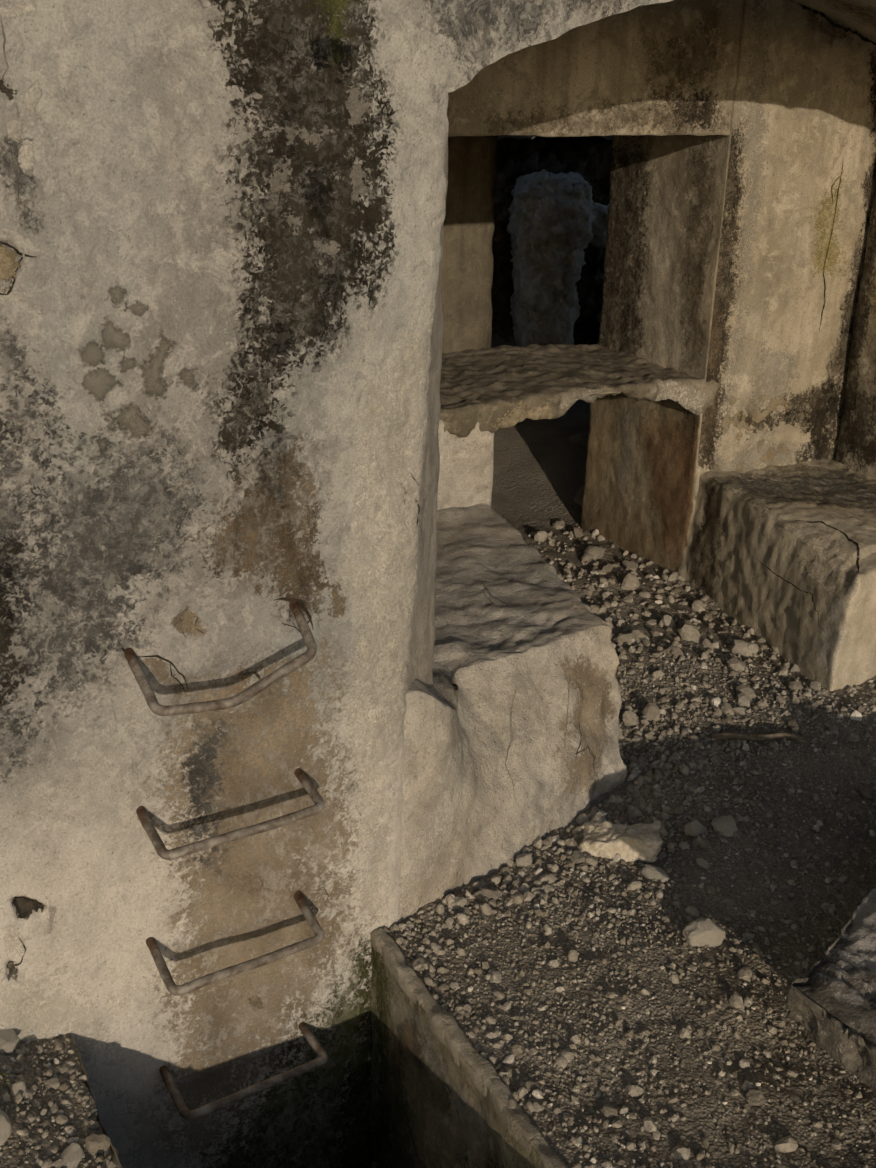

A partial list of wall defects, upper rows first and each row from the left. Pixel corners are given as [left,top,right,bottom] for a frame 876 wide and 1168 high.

damp [429,0,635,81]
crack [790,0,876,103]
spalling [0,241,35,295]
damp [489,0,876,513]
damp [0,0,398,782]
spalling [3,896,55,982]